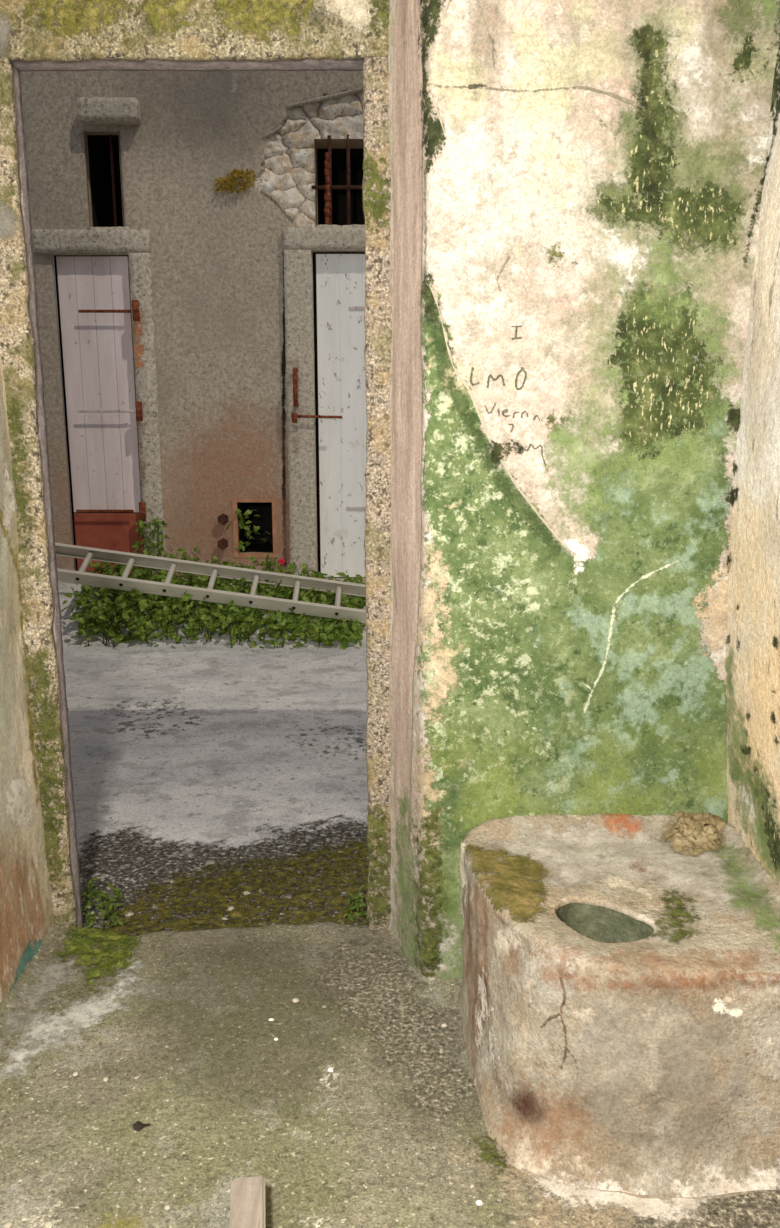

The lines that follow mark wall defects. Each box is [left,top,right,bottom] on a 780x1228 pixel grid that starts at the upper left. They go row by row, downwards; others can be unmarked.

crack [426,34,644,109]
corrosion [323,152,332,225]
damp [420,289,561,556]
crack [540,977,578,1069]